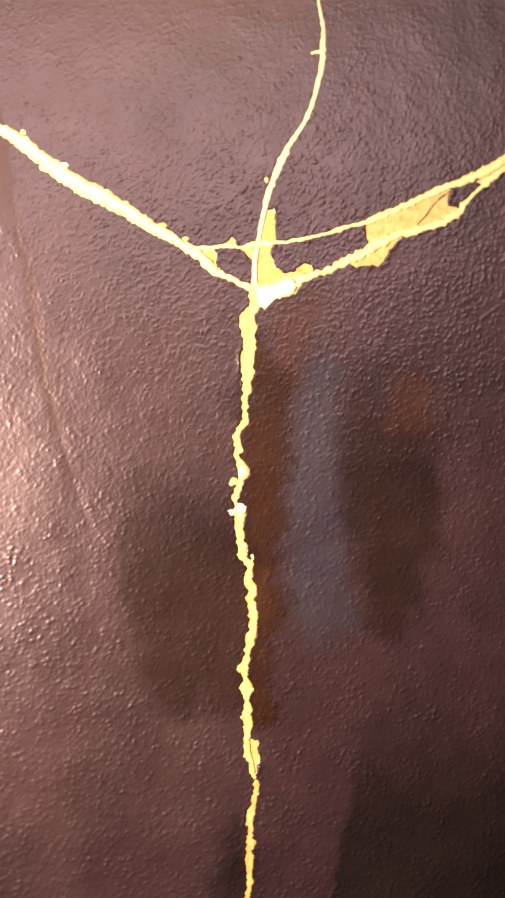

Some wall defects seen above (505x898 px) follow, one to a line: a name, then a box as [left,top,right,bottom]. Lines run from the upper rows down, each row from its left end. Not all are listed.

crack [0,0,505,292]
peeling [227,209,313,285]
peeling [350,189,457,268]
crack [227,166,505,779]
damp [345,421,436,632]
damp [126,532,258,708]
crack [244,780,260,898]